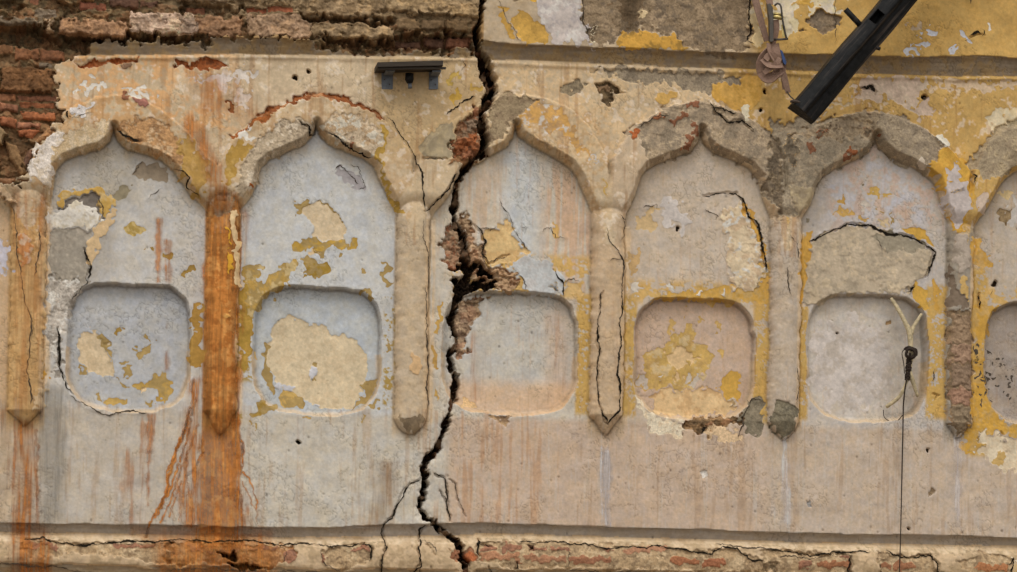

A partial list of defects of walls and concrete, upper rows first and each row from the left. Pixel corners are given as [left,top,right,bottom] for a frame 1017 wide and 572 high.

spalling [418,91,600,172]
rust [146,192,269,572]
spalling [0,0,485,431]
crack [0,0,561,572]
peeling [409,212,585,375]
crack [596,204,657,424]
spalling [498,0,1017,473]
crack [705,193,936,294]
rust [13,424,49,572]
spalling [27,538,298,571]
spalling [449,539,853,572]
crack [515,541,939,572]